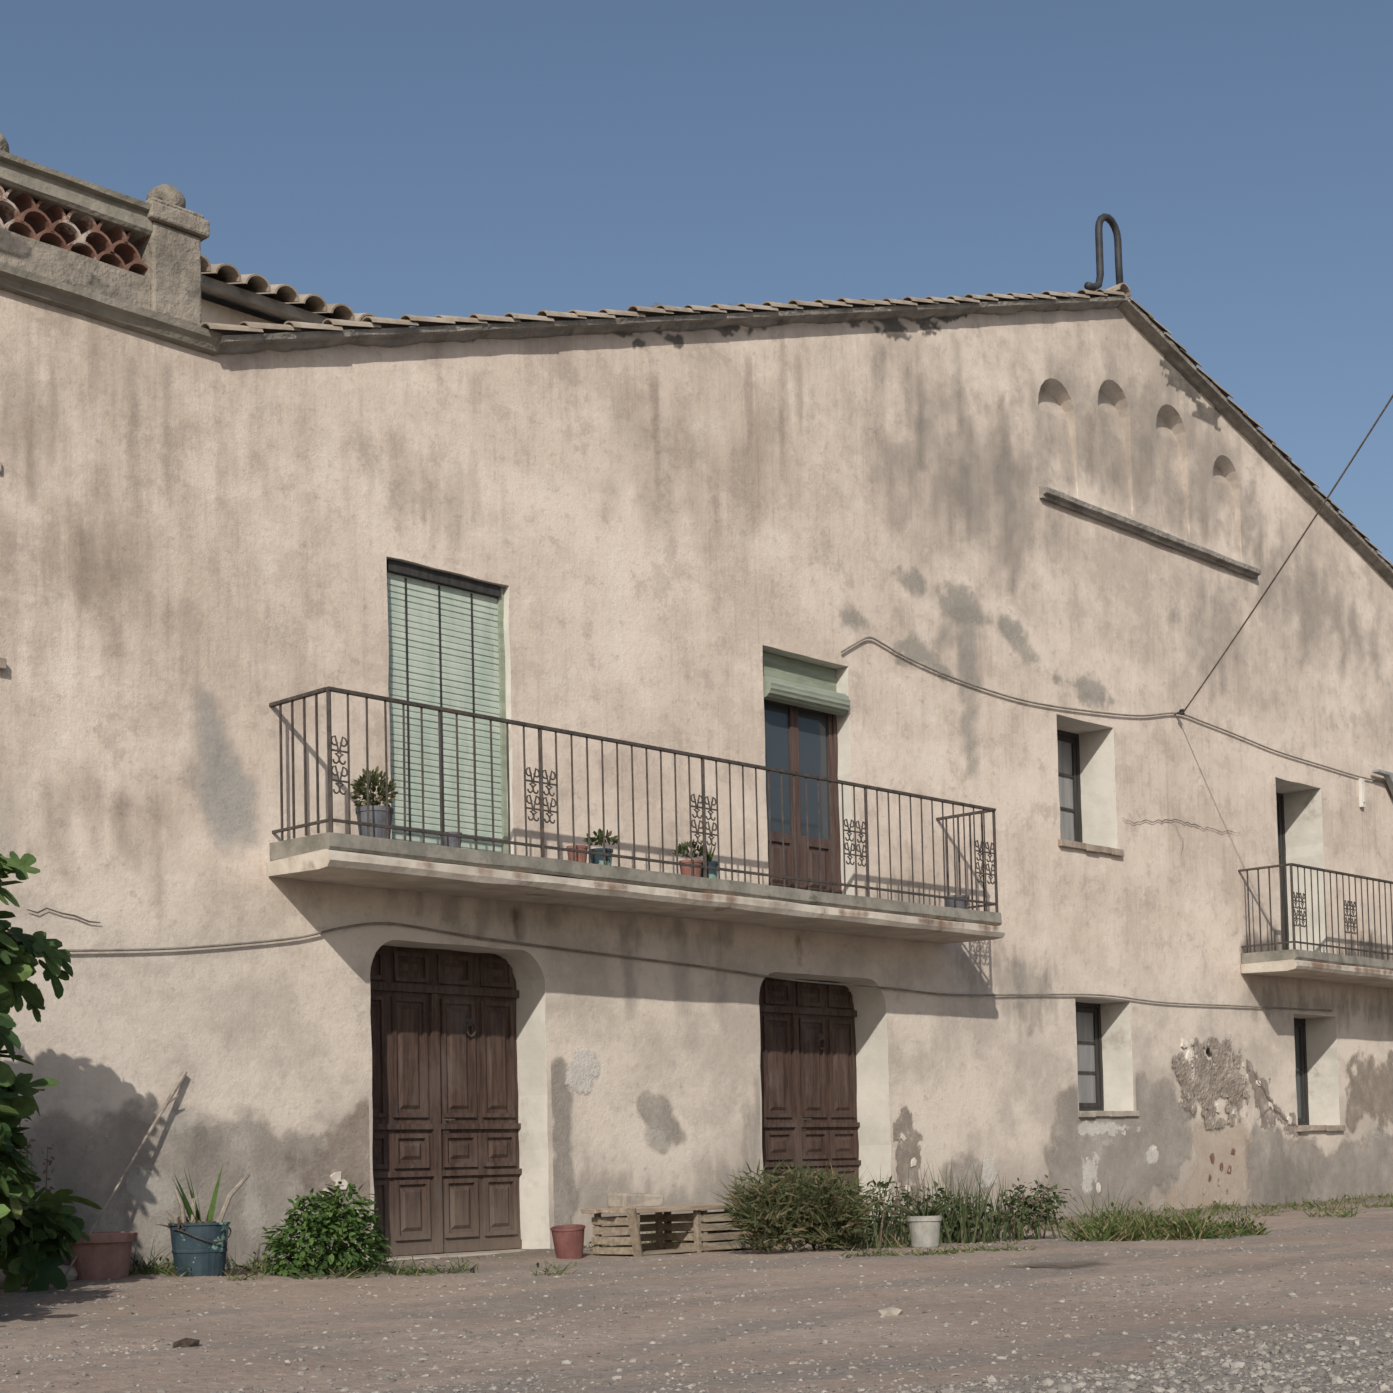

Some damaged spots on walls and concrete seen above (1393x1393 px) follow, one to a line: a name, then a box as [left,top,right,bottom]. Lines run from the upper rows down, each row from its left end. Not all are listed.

peeling [637,1092,684,1148]
flaking render [893,1106,923,1204]
flaking render [1172,1036,1301,1141]
flaking render [1346,1051,1393,1132]